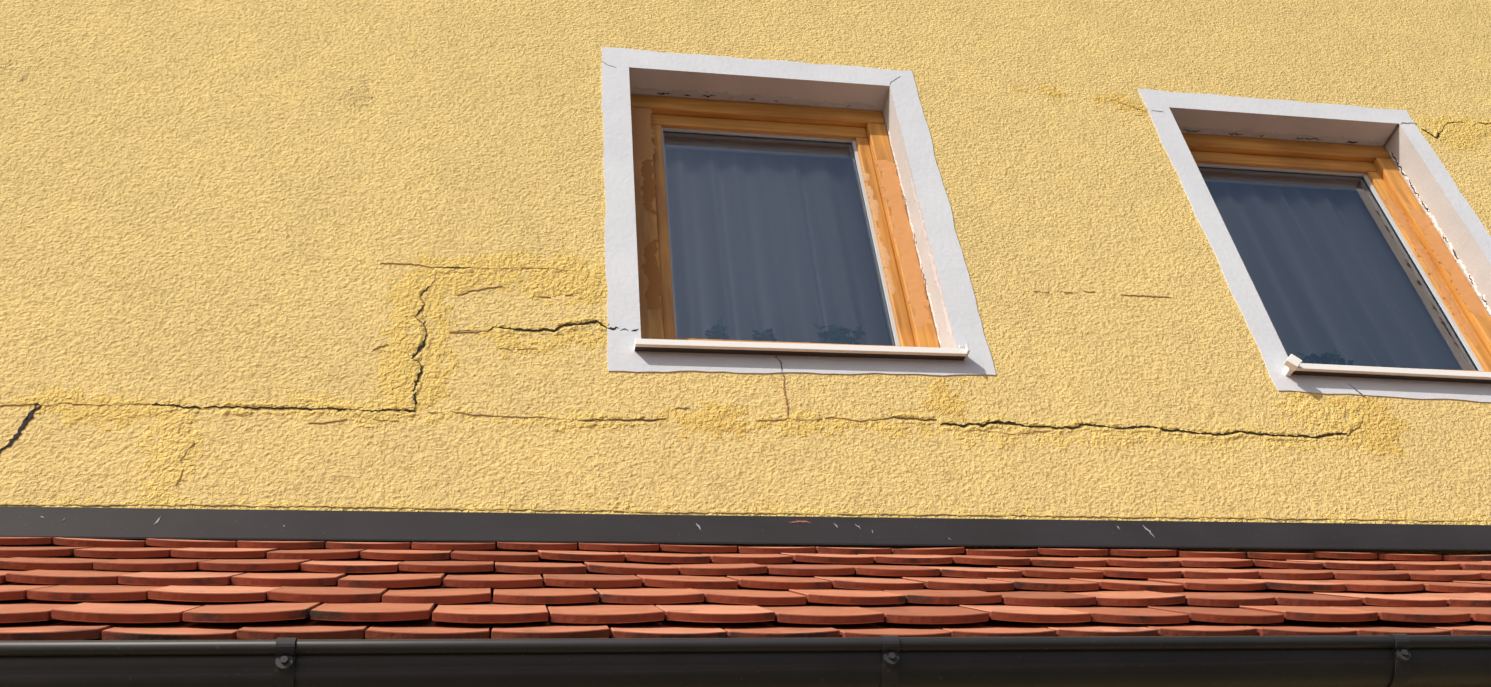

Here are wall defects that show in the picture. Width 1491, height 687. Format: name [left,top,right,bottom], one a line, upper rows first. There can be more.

crack [1401,121,1491,139]
crack [0,262,1491,522]